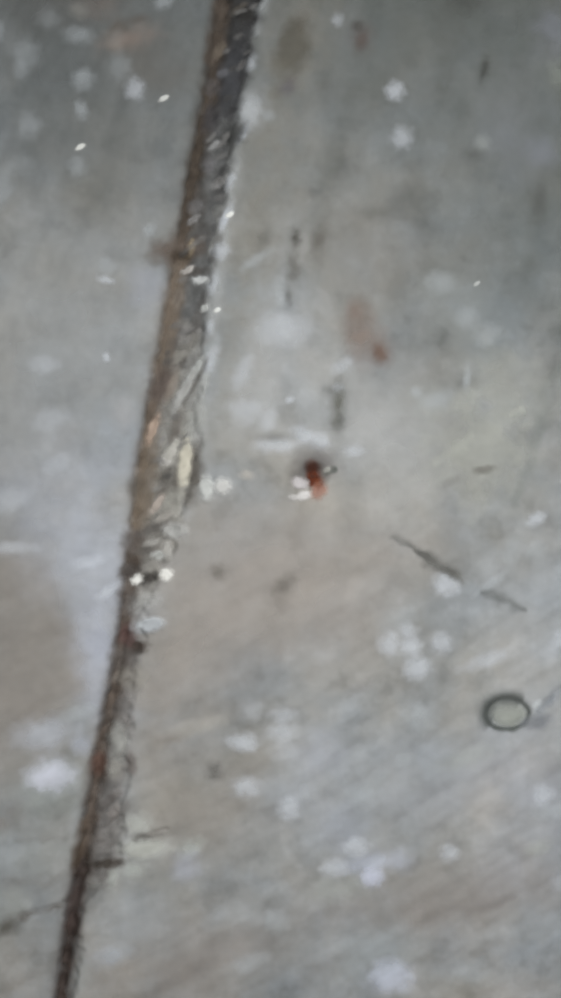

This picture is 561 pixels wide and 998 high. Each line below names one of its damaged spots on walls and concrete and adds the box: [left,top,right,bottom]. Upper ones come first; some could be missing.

crack [21,0,262,998]
rust [295,454,337,499]